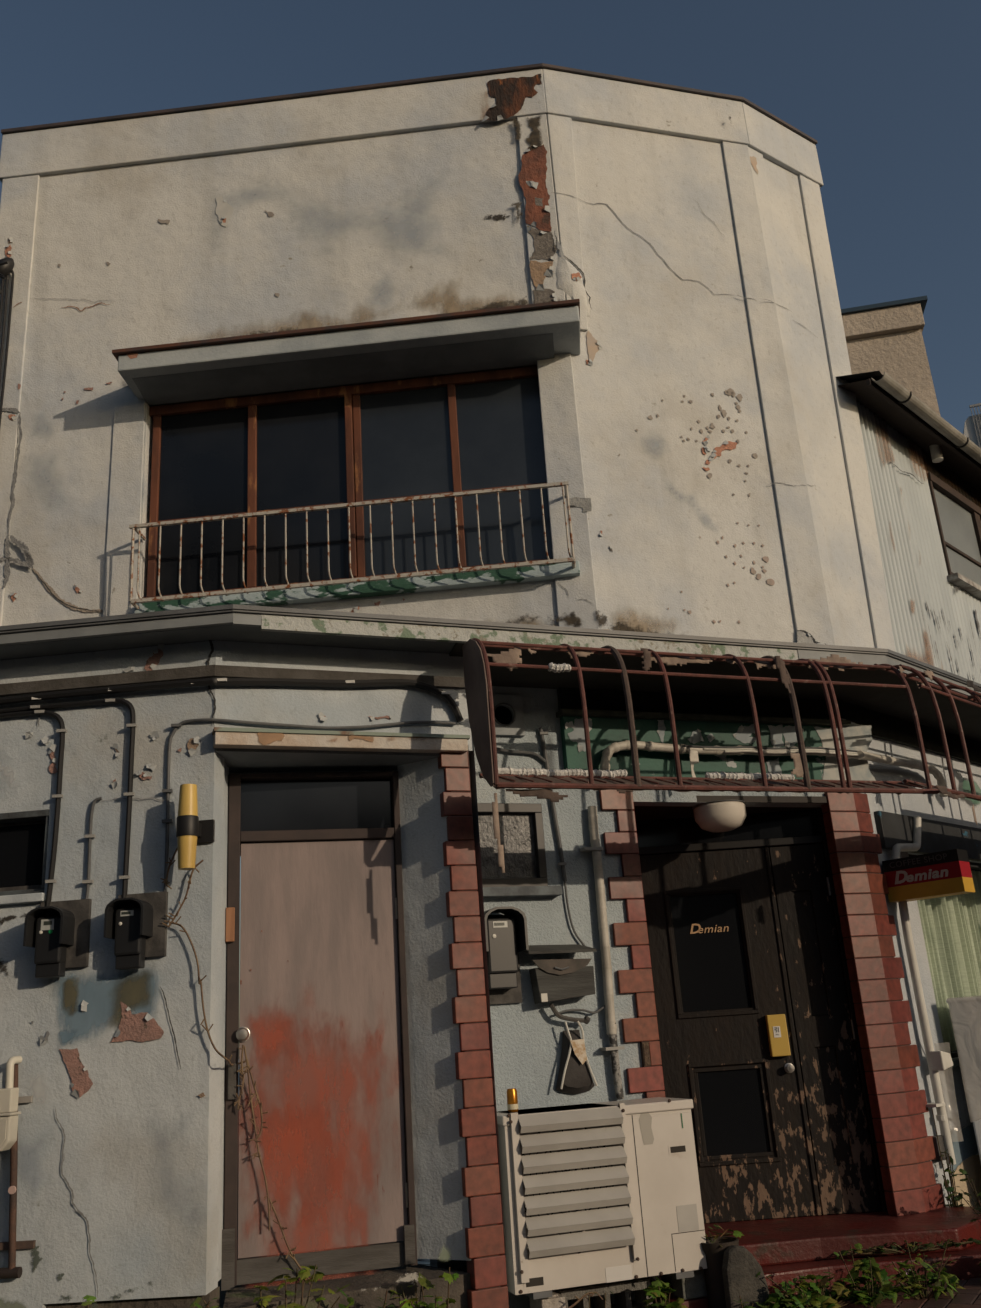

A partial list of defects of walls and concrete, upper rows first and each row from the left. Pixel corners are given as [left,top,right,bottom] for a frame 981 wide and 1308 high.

spalling [481,74,542,122]
spalling [518,144,557,304]
leakage [250,315,337,335]
leakage [422,289,559,313]
peeling [586,331,603,365]
crack [553,192,818,338]
spalling [680,388,758,497]
crack [0,408,103,613]
leakage [507,610,659,633]
peeling [31,1021,93,1099]
peeling [110,1002,164,1043]
crack [55,1107,98,1297]